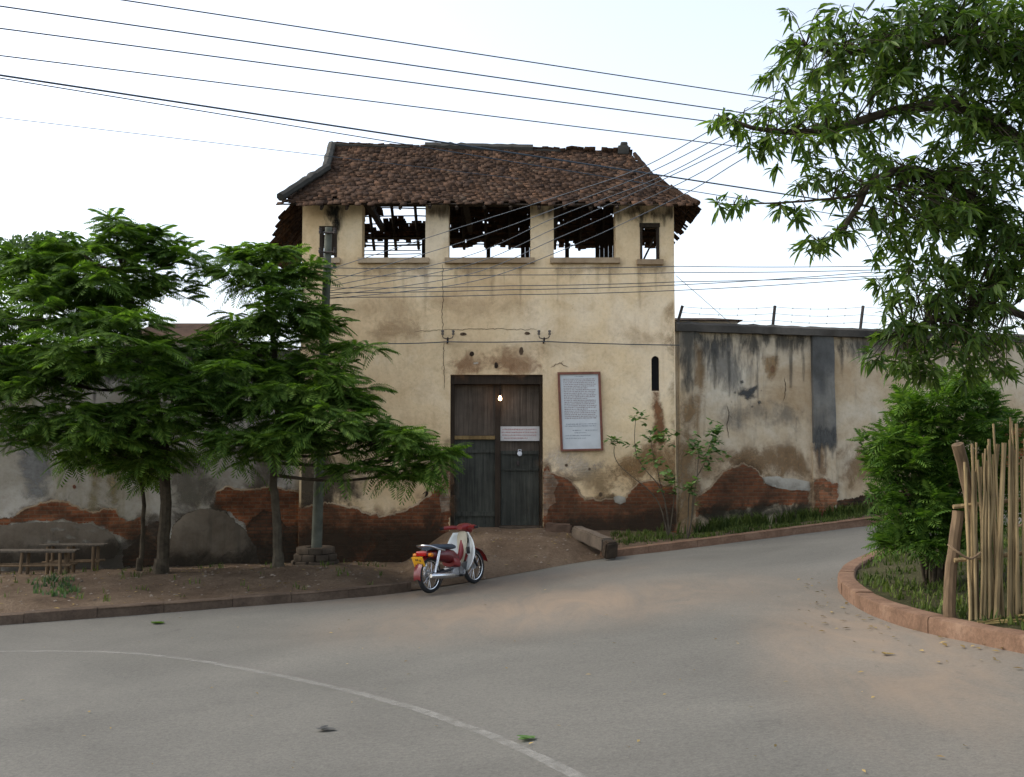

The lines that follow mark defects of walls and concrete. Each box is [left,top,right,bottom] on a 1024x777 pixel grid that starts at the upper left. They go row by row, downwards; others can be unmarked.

corrosion [652,392,665,446]
damp [621,322,837,533]
flaking render [0,499,157,567]
flaking render [213,471,453,564]
flaking render [543,463,679,533]
flaking render [695,462,912,517]